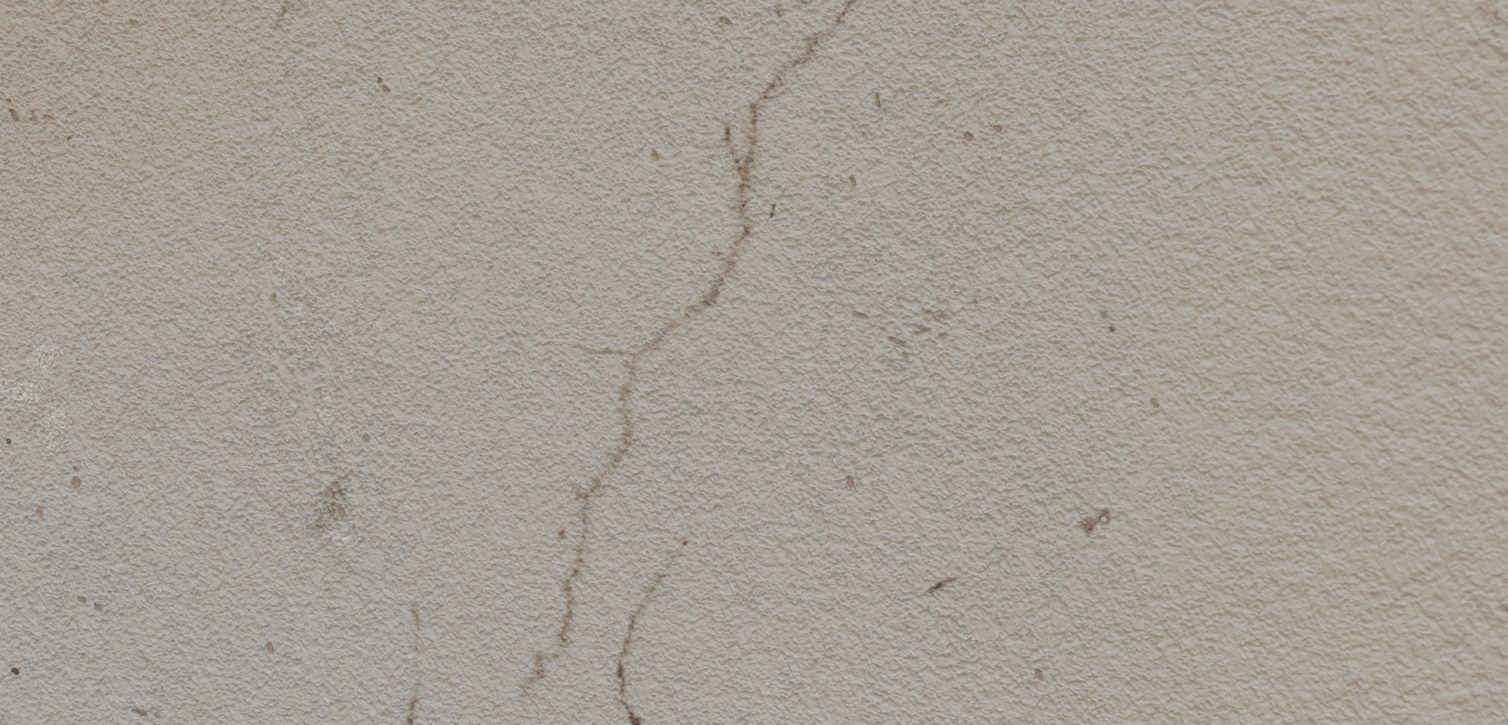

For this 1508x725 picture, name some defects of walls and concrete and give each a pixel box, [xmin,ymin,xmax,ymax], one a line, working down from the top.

crack [514,0,865,725]